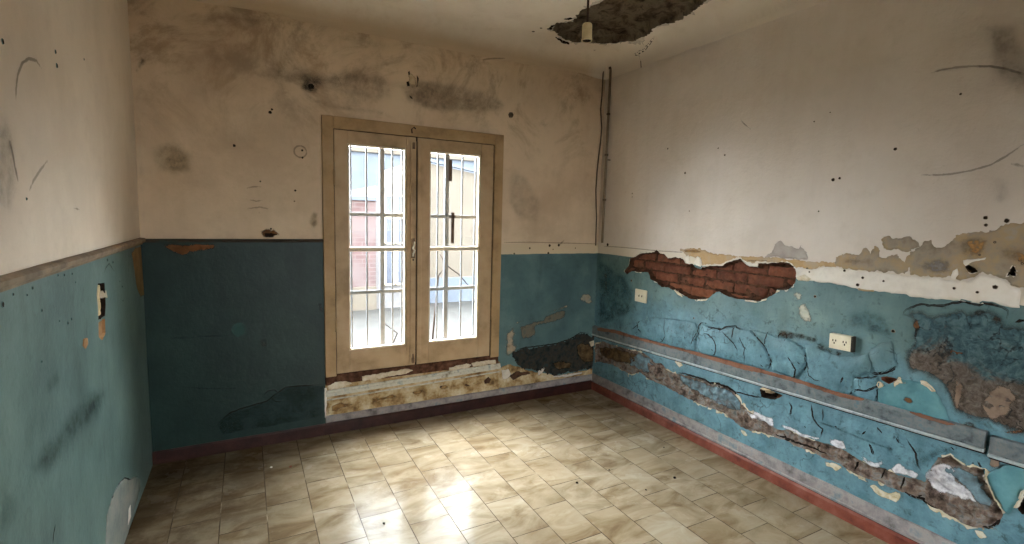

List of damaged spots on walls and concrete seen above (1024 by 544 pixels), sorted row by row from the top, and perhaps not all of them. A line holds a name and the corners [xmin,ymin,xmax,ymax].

spalling [547,0,711,45]
peeling [624,223,1024,303]
spalling [82,283,108,349]
crack [632,320,898,454]
spalling [328,341,1003,538]
peeling [105,477,140,544]